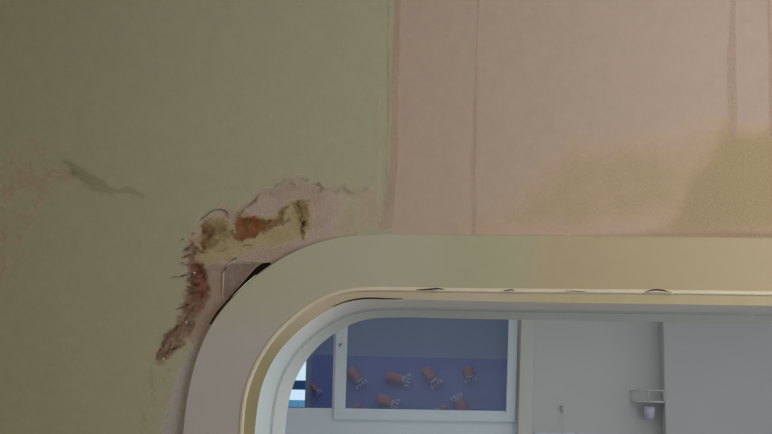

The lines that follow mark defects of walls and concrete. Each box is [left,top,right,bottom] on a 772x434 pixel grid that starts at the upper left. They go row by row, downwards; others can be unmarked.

leakage [519,0,772,237]
rust [156,199,313,360]
crack [210,263,271,325]
peeling [162,176,354,434]